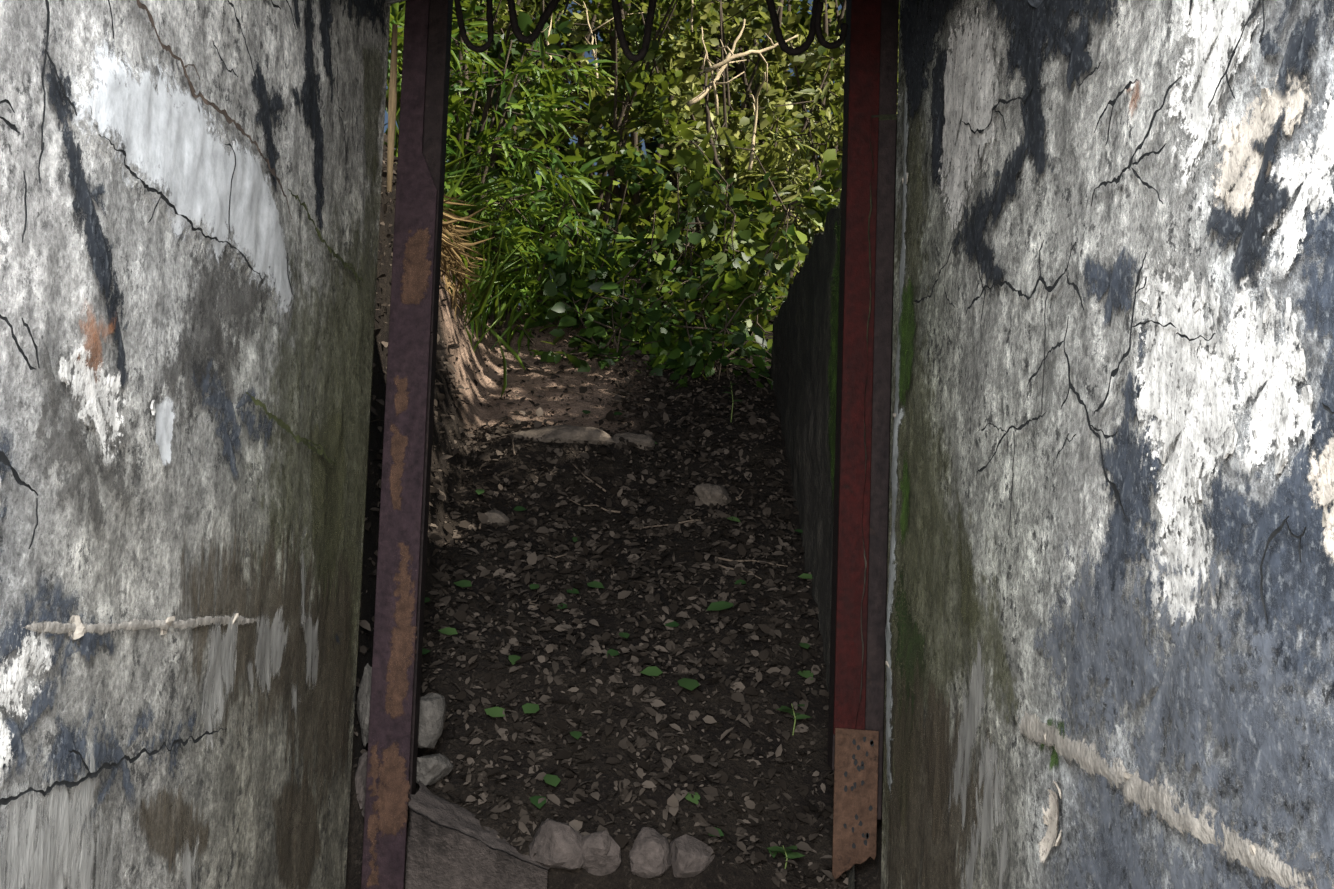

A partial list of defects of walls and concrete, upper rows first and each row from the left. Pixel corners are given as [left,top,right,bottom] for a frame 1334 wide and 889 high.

crack [0,0,364,295]
water stain [952,15,1093,297]
peeling [0,631,52,780]
crack [0,728,228,805]
water stain [0,551,321,889]
rust [367,742,410,888]
rust [389,376,410,510]
rust [385,542,416,719]
spalling [1038,781,1062,863]
crack [912,239,1216,535]
water stain [1034,196,1334,889]
peeling [1134,0,1334,636]